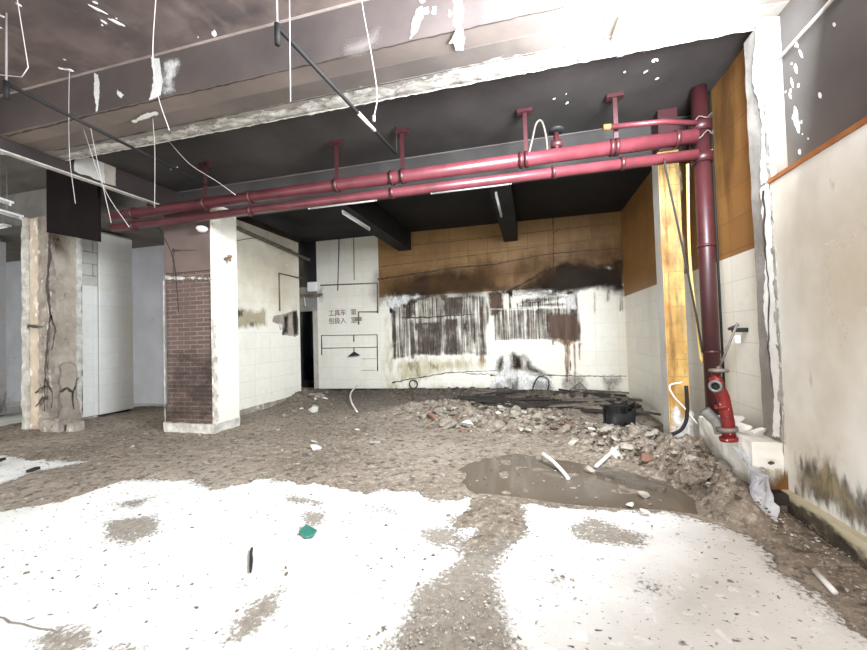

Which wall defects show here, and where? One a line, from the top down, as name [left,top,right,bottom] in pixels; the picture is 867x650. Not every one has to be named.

peeling [0,155,46,196]
spalling [57,0,787,444]
damp [383,260,580,374]
rust [552,339,580,381]
damp [787,459,867,570]